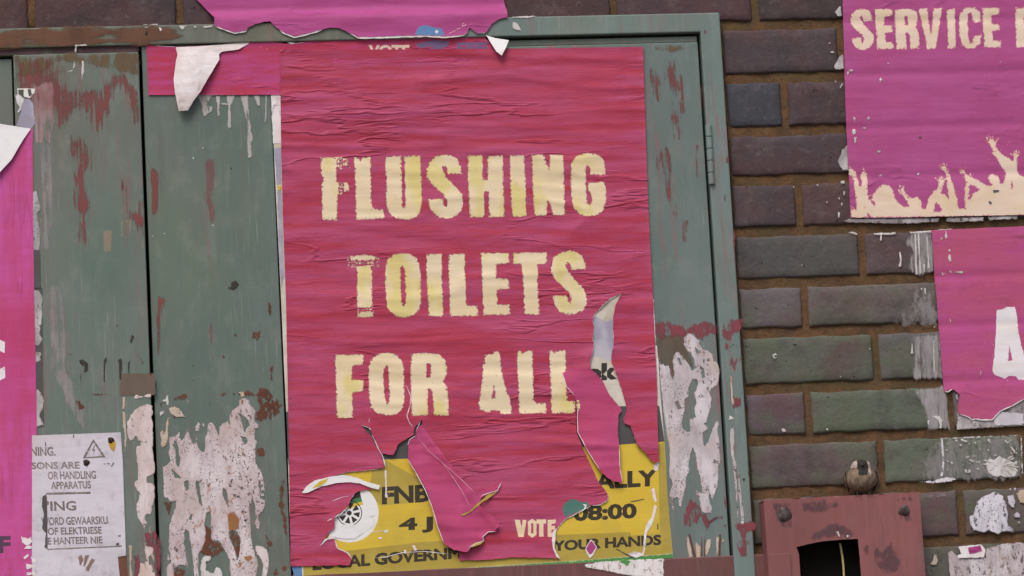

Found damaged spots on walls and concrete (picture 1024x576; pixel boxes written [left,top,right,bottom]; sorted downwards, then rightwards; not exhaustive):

peeling [16,58,139,131]
peeling [71,137,92,243]
peeling [126,168,158,229]
peeling [116,392,269,576]
corrosion [222,366,282,421]
peeling [655,319,756,556]